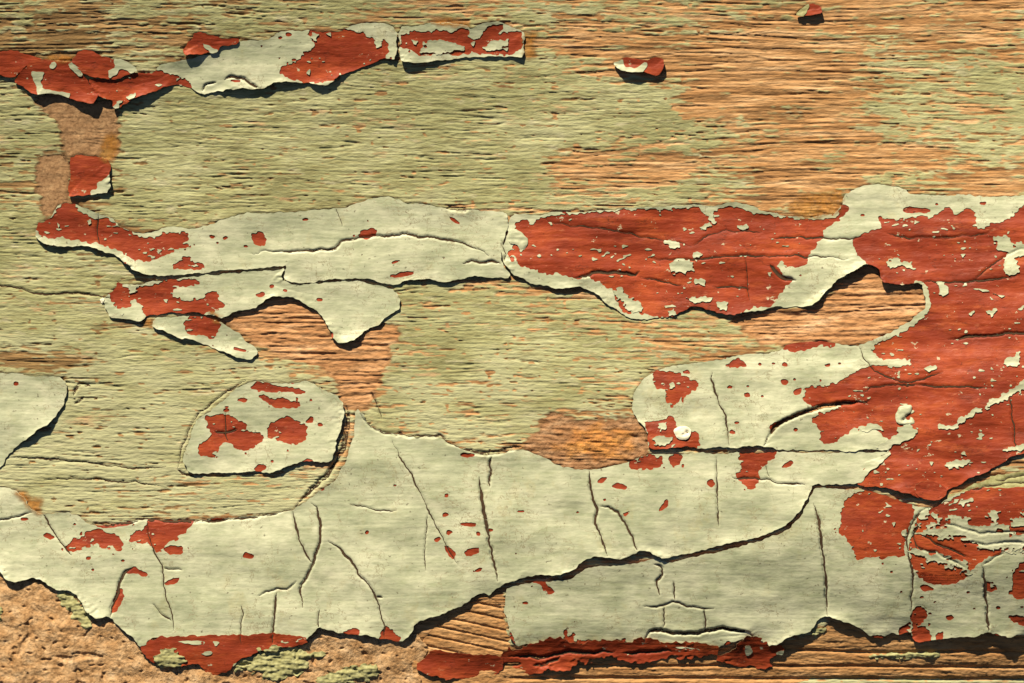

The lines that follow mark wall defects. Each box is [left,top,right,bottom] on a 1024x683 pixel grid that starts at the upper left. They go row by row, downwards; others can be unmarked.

spalling [0,21,525,262]
peeling [614,57,664,76]
peeling [796,4,822,16]
crack [93,395,523,642]
peeling [0,184,1024,683]
crack [504,471,752,667]
crack [710,347,1016,611]
crack [905,510,1024,634]